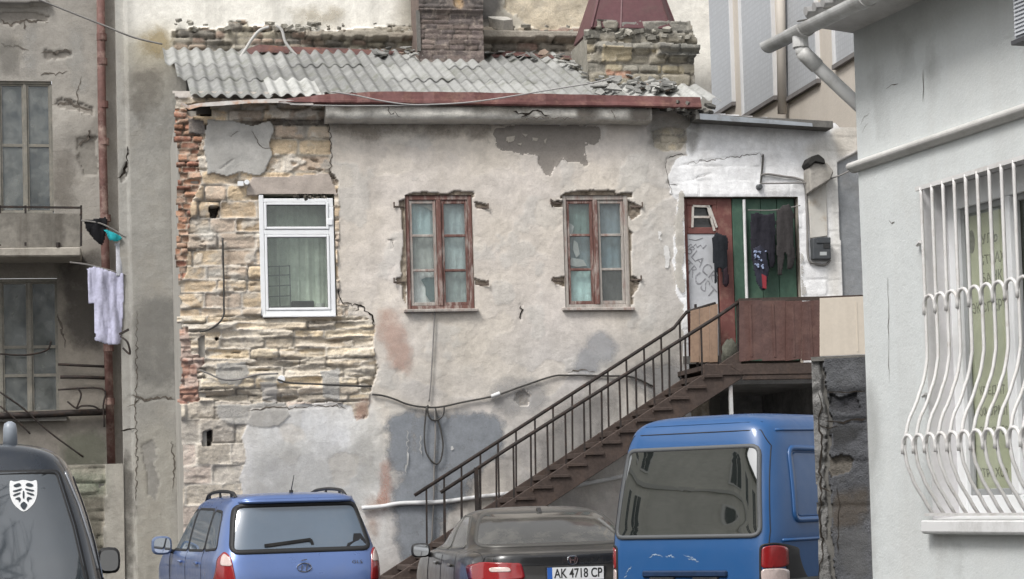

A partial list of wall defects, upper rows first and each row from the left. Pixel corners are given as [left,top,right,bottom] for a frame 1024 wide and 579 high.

flaking render [46,50,70,60]
flaking render [56,98,92,115]
crack [118,146,129,178]
flaking render [174,109,202,280]
peeling [493,125,601,176]
crack [338,291,374,325]
flaking render [177,328,205,404]
crack [122,315,172,509]
water stain [387,410,503,560]
spalling [811,361,860,579]